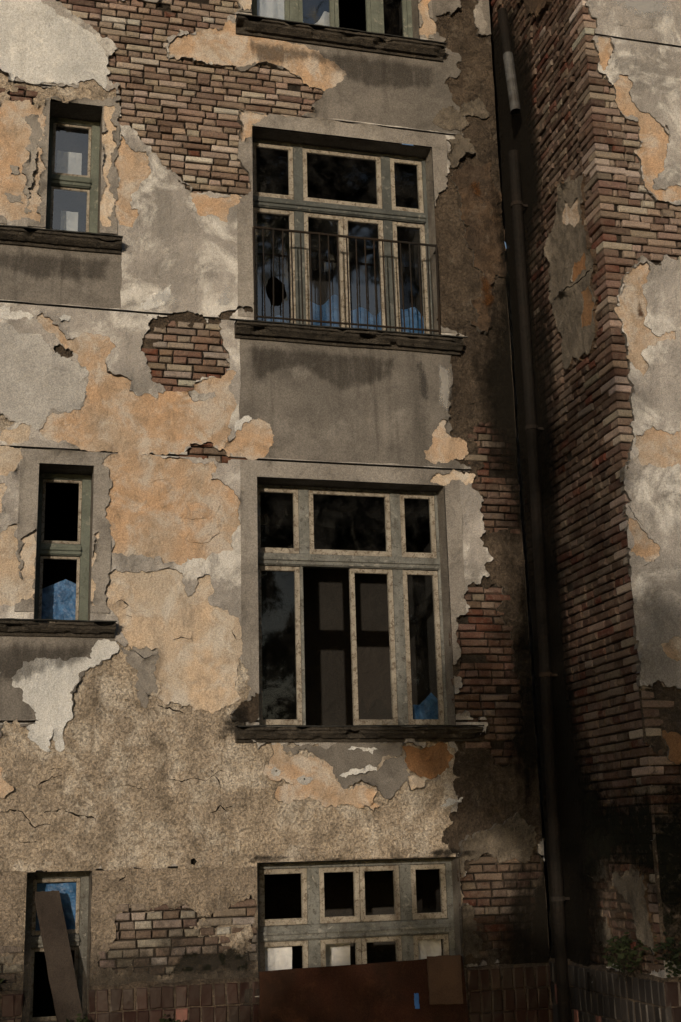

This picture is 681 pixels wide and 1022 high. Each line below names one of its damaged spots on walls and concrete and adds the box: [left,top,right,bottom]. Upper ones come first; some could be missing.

crack [172,770,232,813]
flaking render [0,0,545,990]
flaking render [491,0,681,974]